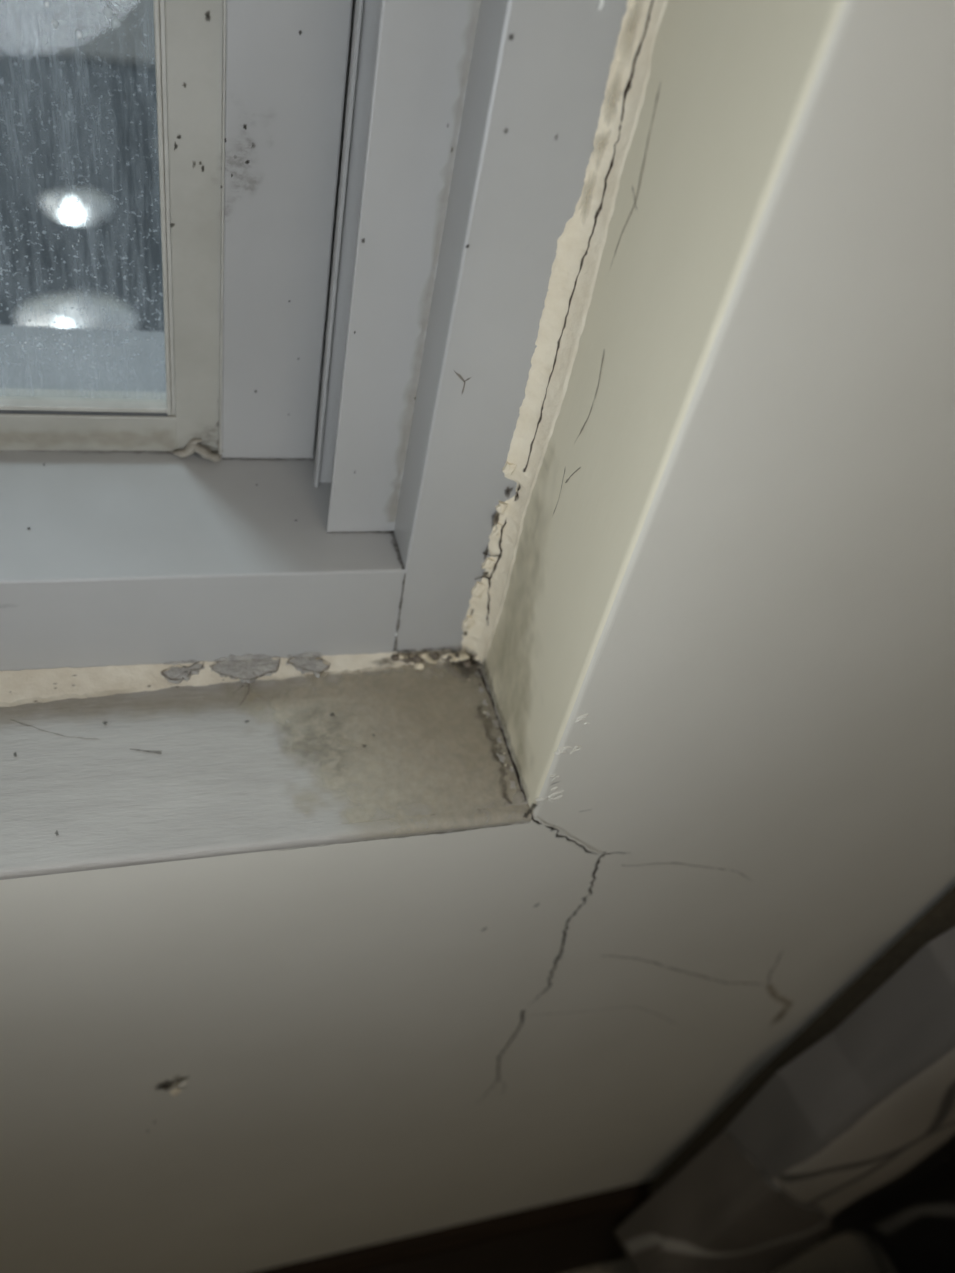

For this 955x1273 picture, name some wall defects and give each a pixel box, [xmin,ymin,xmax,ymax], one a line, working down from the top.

crack [475,0,661,626]
spalling [462,461,517,636]
peeling [161,652,330,684]
damp [247,665,531,834]
crack [365,660,647,1100]